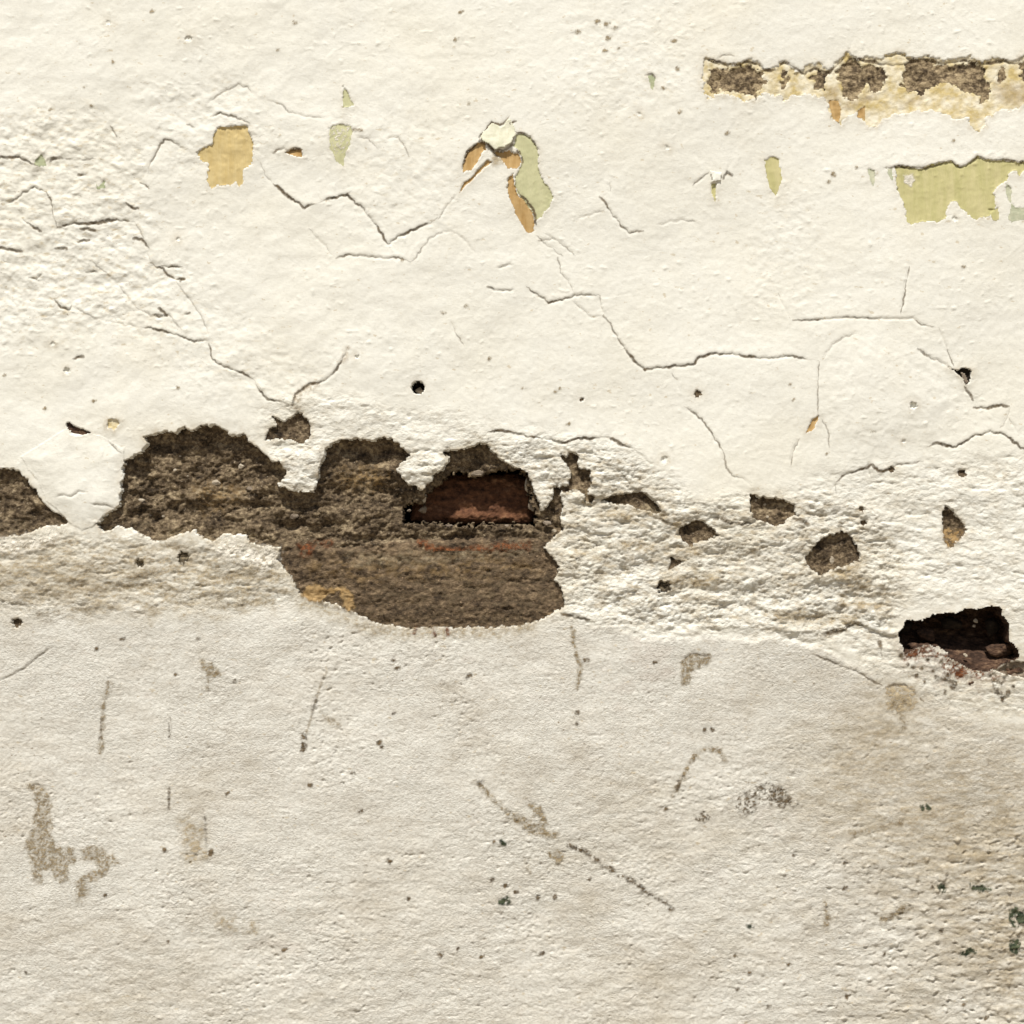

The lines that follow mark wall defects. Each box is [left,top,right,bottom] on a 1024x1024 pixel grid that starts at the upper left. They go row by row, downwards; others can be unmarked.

peeling [702,51,1024,132]
crack [275,185,362,209]
peeling [857,155,1024,225]
crack [33,205,139,250]
crack [377,223,428,260]
crack [614,332,756,371]
crack [562,436,624,445]
crack [930,434,1024,449]
flaking render [0,413,661,629]
flaking render [750,495,796,526]
flaking render [805,531,860,575]
spalling [898,605,1024,685]